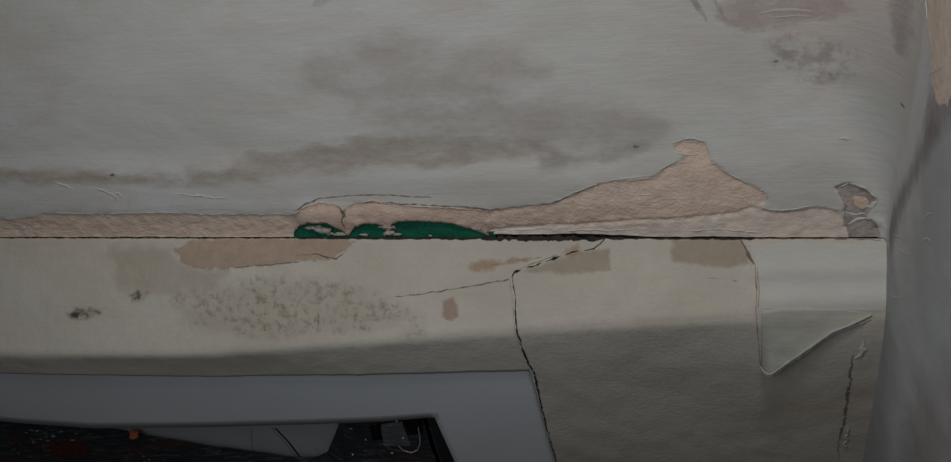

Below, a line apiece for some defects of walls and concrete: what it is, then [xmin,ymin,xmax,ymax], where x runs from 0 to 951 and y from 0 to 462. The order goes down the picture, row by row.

spalling [925,0,951,107]
spalling [0,137,882,269]
crack [18,194,824,462]
crack [837,340,868,455]